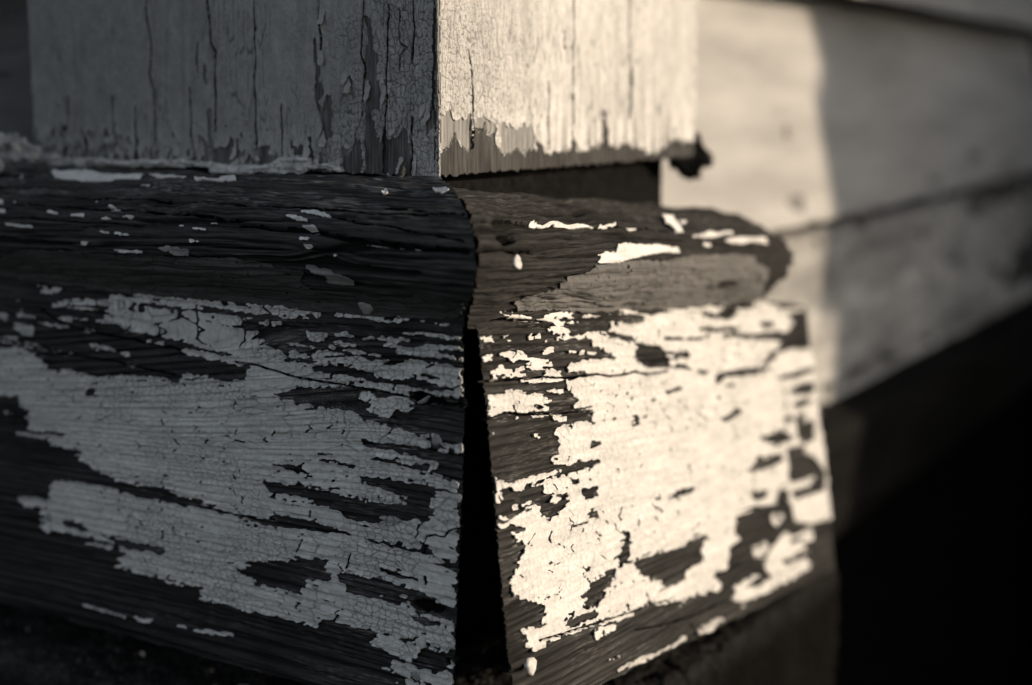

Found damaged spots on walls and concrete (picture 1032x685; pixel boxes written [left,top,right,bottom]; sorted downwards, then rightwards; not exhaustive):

crack [190,0,217,161]
peeling [35,16,417,188]
crack [253,0,283,157]
crack [360,0,436,175]
crack [467,50,475,152]
peeling [419,102,694,178]
crack [0,194,534,255]
peeling [286,210,331,249]
crack [474,316,543,324]
peeling [0,223,465,685]
peeling [479,231,870,652]
peeling [608,617,725,672]